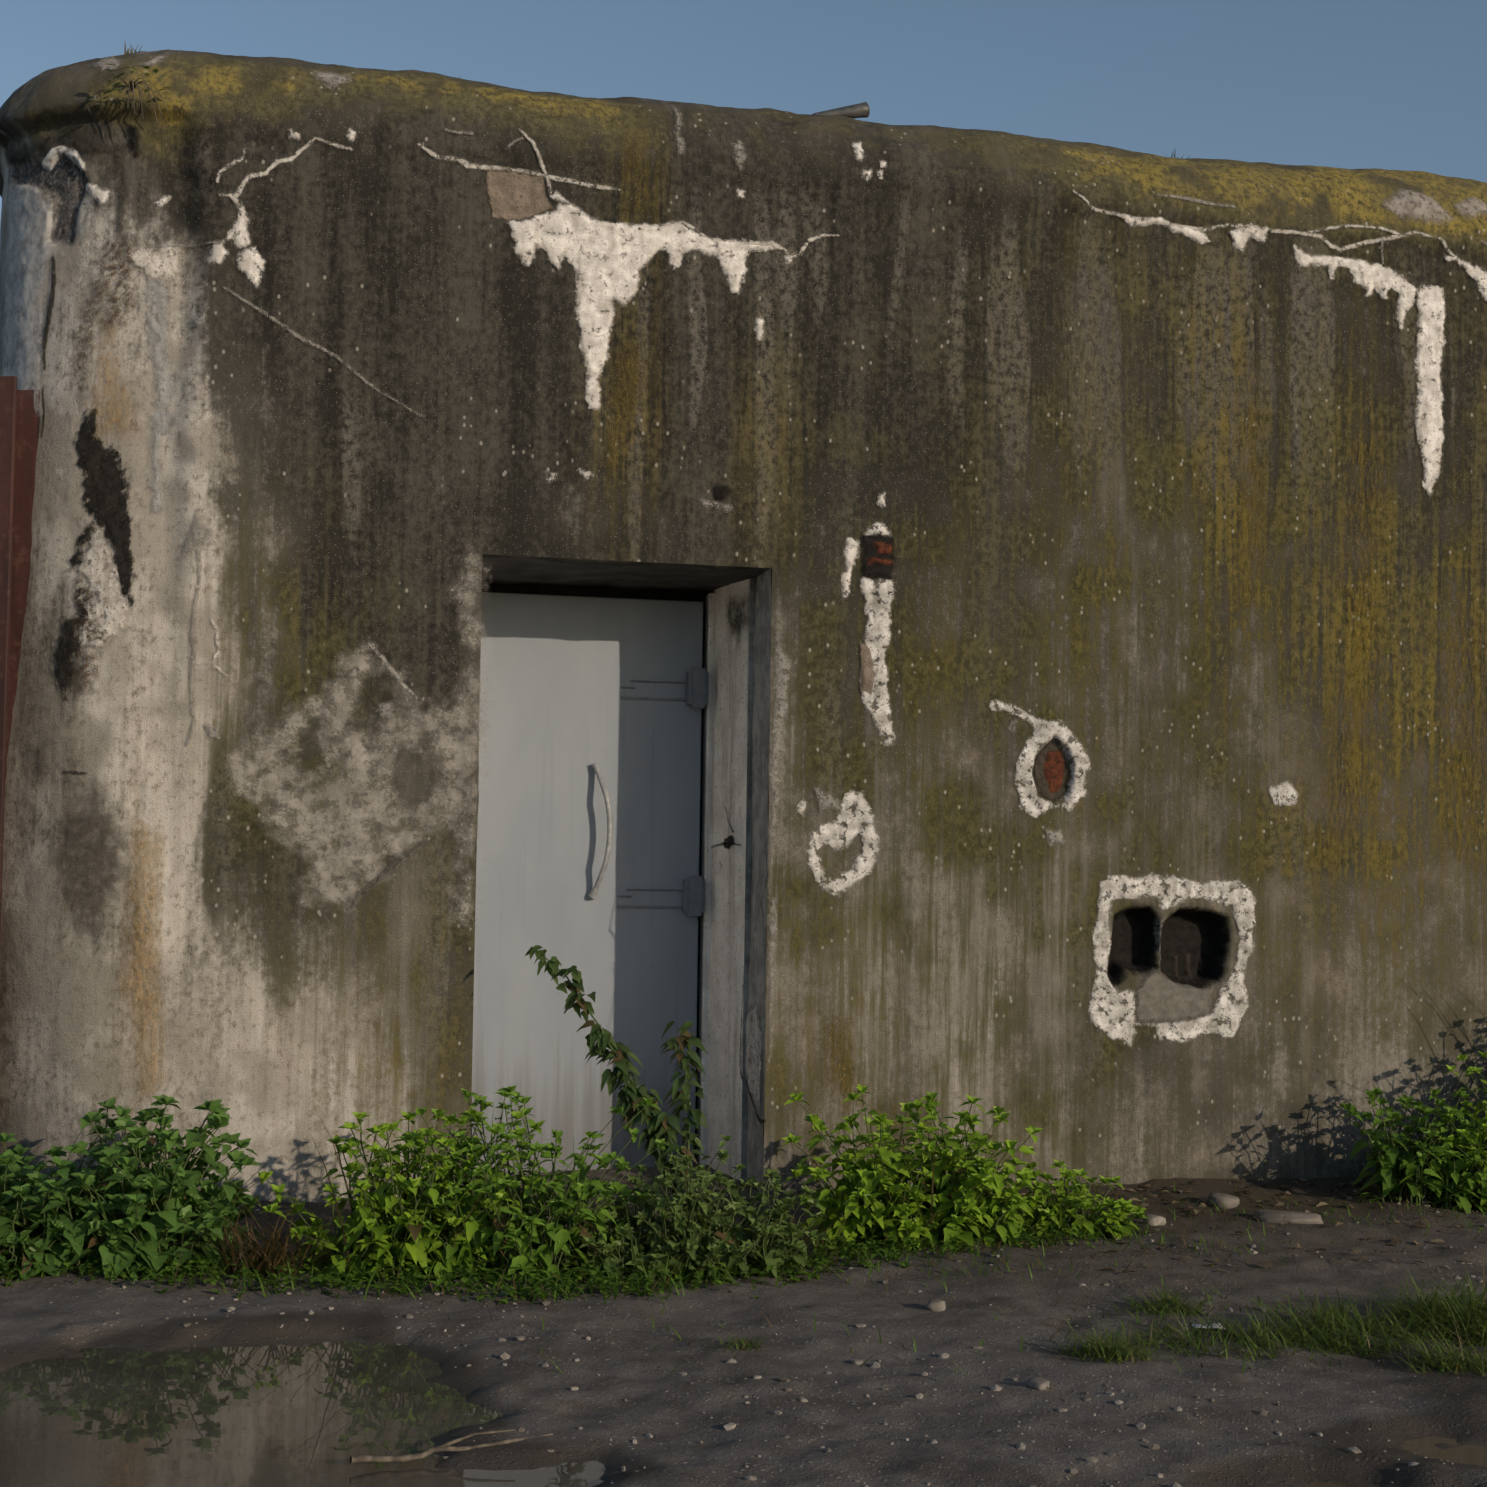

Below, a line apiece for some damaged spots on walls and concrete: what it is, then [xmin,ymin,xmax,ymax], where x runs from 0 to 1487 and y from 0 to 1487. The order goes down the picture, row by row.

water stain [209,207,264,286]
crack [216,129,356,209]
crack [223,287,422,416]
water stain [510,193,791,409]
water stain [1125,214,1210,244]
crack [1074,191,1487,264]
water stain [1293,245,1446,493]
spalling [841,523,896,745]
spalling [230,644,480,909]
spalling [798,788,880,895]
spalling [989,700,1091,846]
spalling [1089,873,1256,1046]